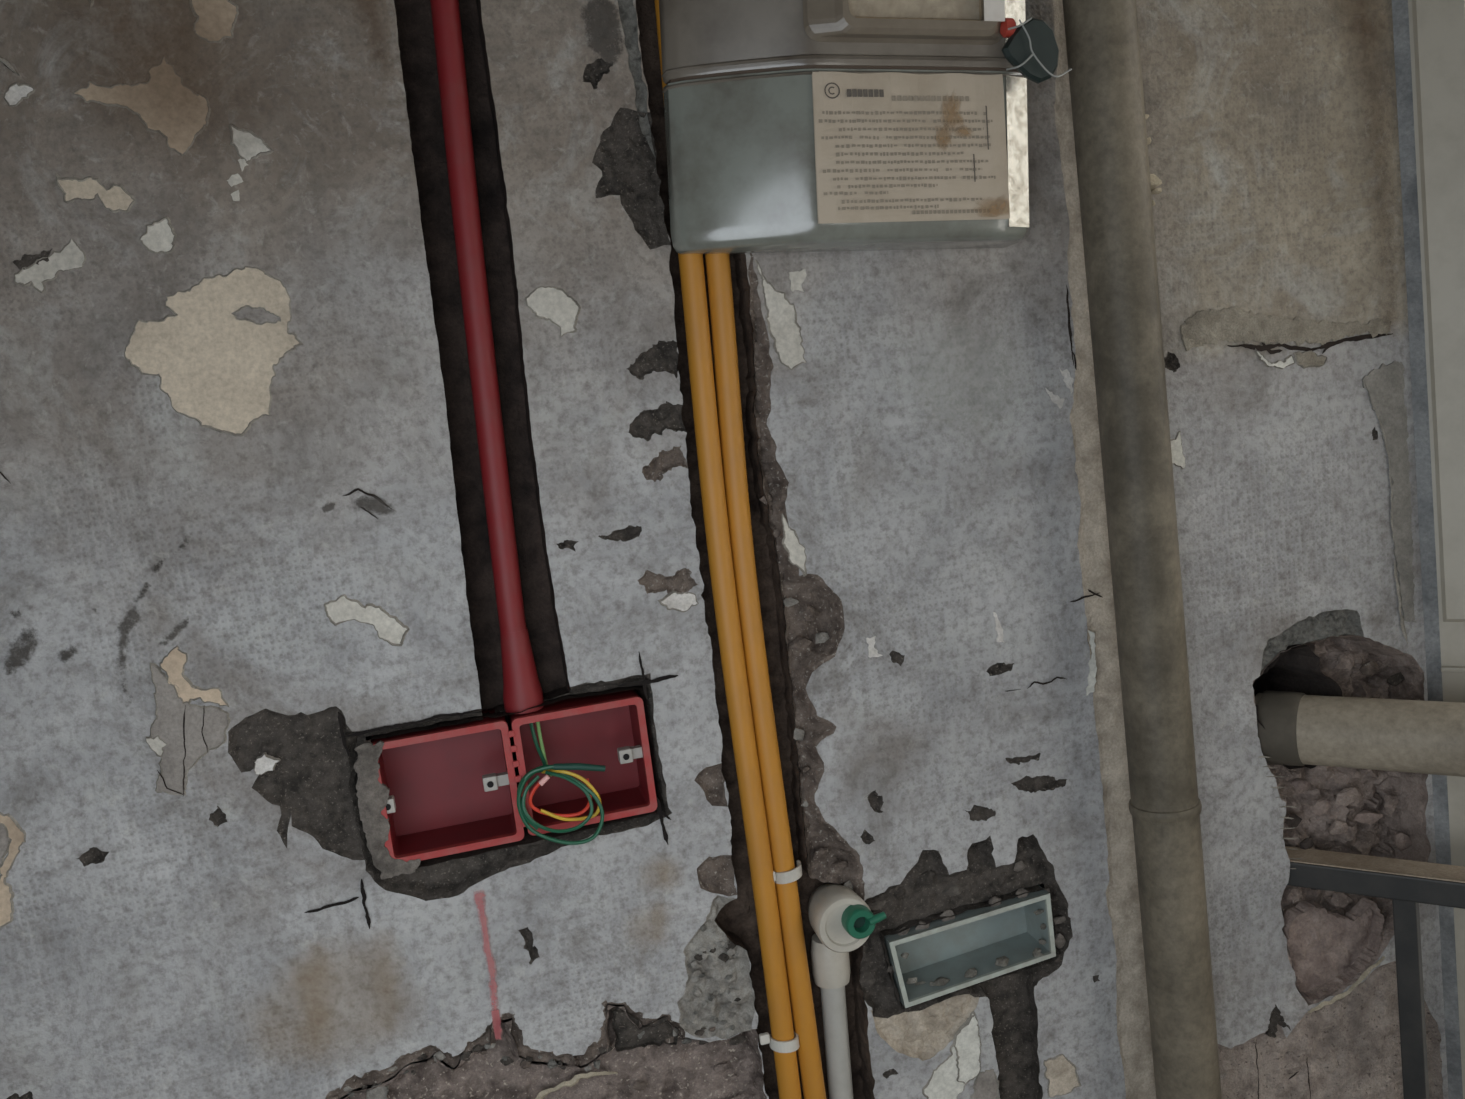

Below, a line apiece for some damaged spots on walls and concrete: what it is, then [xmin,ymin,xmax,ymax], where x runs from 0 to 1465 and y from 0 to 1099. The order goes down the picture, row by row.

peeling [73,57,211,156]
peeling [189,0,239,43]
peeling [227,123,274,201]
flaking render [582,0,671,249]
peeling [124,266,303,437]
peeling [525,286,581,337]
crack [1180,306,1393,369]
flaking render [748,253,1073,1099]
flaking render [228,673,672,901]
flaking render [325,855,767,1099]
flaking render [1218,756,1431,1099]
flaking render [7,1091,33,1099]